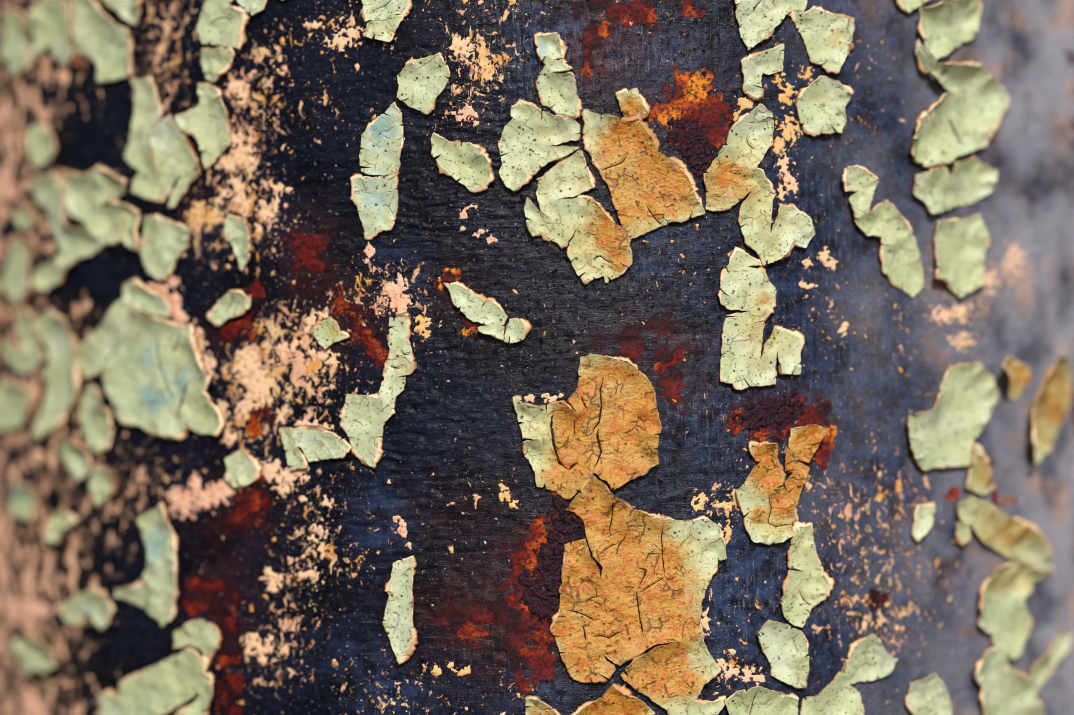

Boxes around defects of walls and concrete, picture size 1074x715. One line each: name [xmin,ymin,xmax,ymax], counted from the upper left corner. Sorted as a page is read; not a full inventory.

peeling [0,0,268,508]
rust [246,405,277,438]
rust [283,231,388,366]
peeling [279,311,418,471]
peeling [349,52,451,240]
peeling [431,0,855,391]
rust [645,66,737,180]
rust [726,388,837,469]
peeling [841,0,1010,298]
rust [431,490,584,693]
crack [568,502,673,639]
peeling [512,353,898,715]